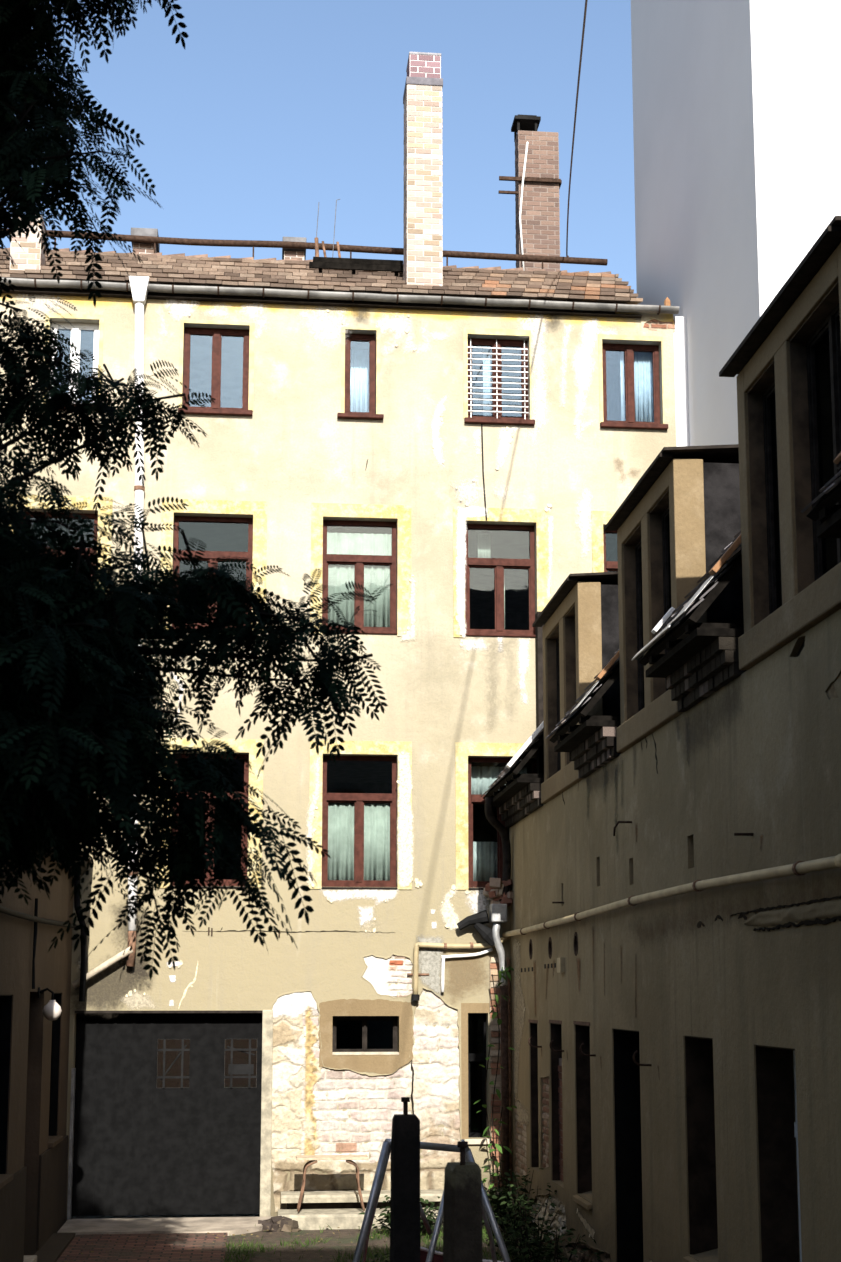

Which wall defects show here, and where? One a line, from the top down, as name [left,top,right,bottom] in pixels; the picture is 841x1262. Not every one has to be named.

flaking render [456,507,502,651]
flaking render [519,640,529,703]
flaking render [306,751,423,933]
crack [185,927,395,935]
flaking render [431,885,486,930]
crack [178,963,198,1009]
spalling [270,953,462,1213]